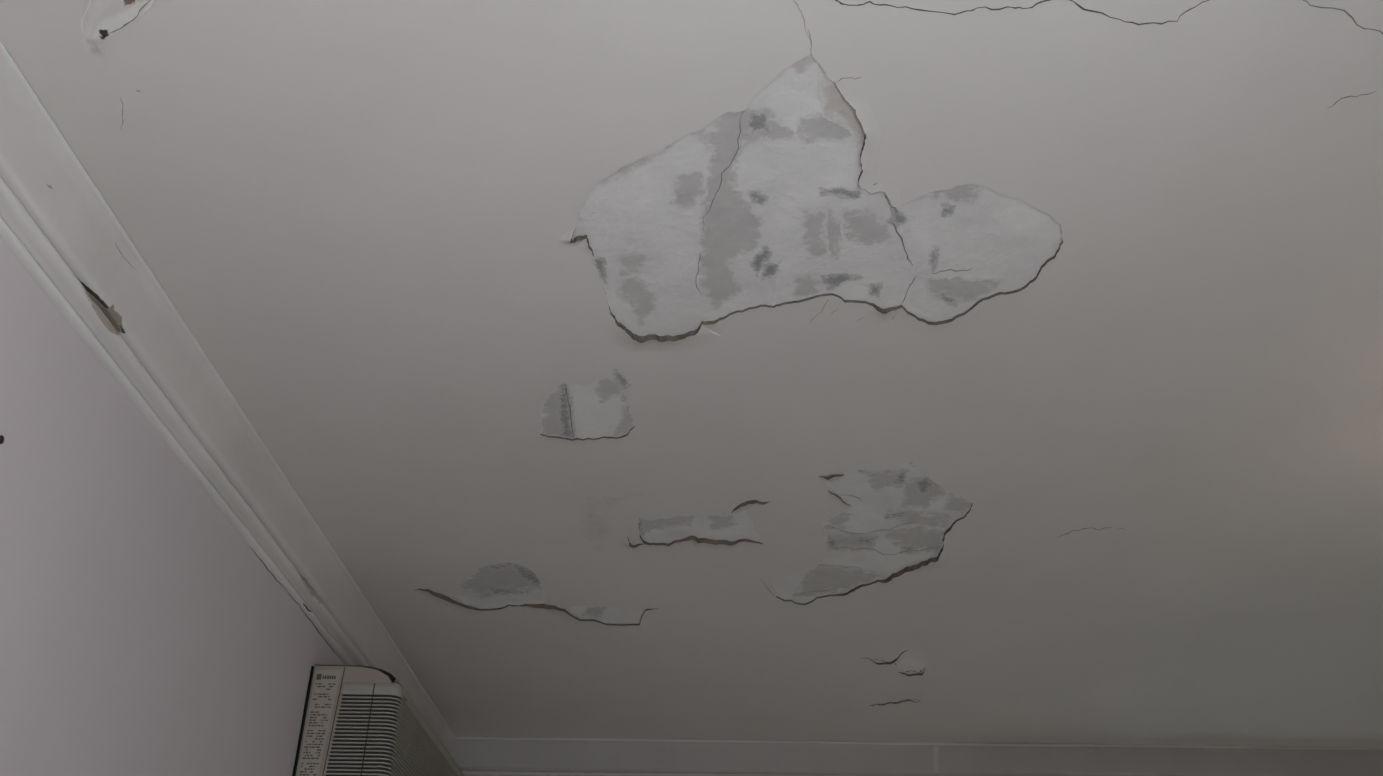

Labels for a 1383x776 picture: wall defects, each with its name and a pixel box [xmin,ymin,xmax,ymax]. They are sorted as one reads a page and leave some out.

flaking render [78,0,172,60]
crack [835,0,1209,25]
crack [1303,0,1383,35]
peeling [540,368,638,446]
peeling [617,500,770,552]
peeling [761,462,980,609]
peeling [414,561,662,631]